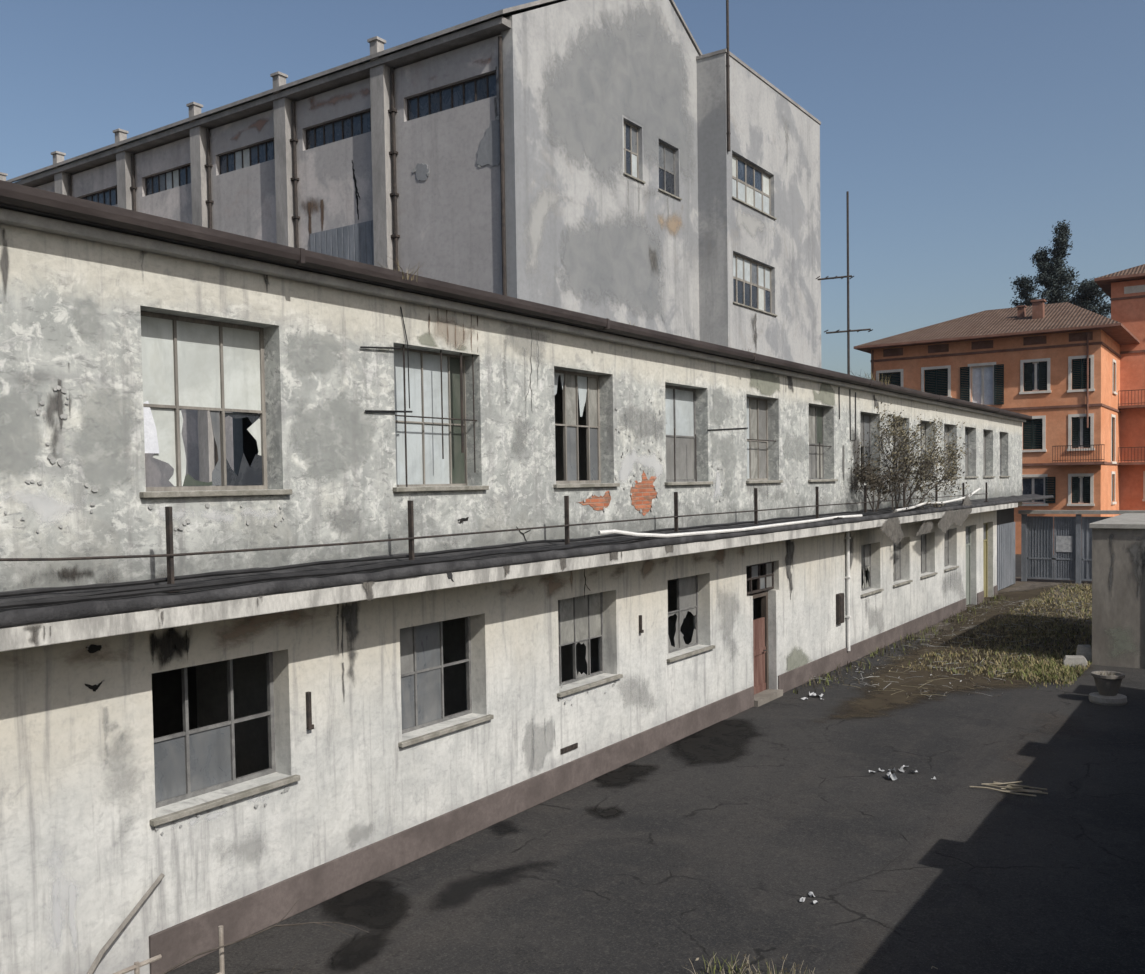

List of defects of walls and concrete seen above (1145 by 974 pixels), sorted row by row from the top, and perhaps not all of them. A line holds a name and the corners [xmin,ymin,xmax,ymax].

rust [307,200,324,234]
flaking render [578,427,662,516]
leakage [785,540,794,590]
leakage [150,608,189,659]
leakage [337,581,374,696]